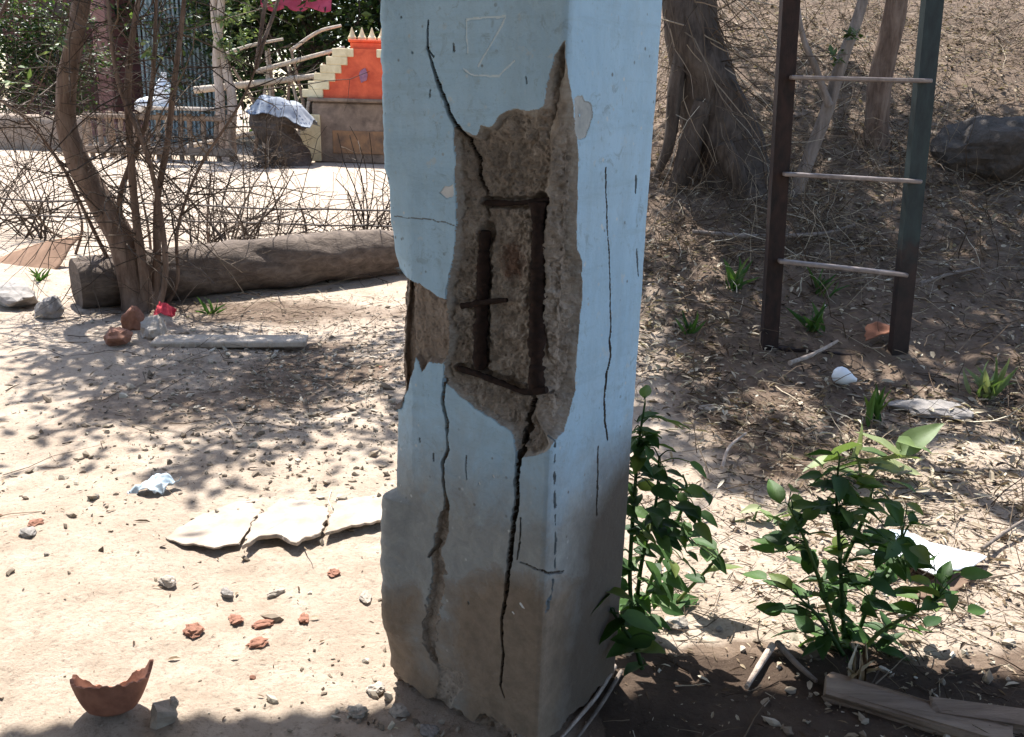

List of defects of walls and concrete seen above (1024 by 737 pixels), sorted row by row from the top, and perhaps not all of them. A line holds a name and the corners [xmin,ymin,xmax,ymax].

crack [426,24,494,217]
spalling [393,41,593,457]
crack [596,167,612,515]
crack [423,377,450,665]
crack [501,398,564,683]